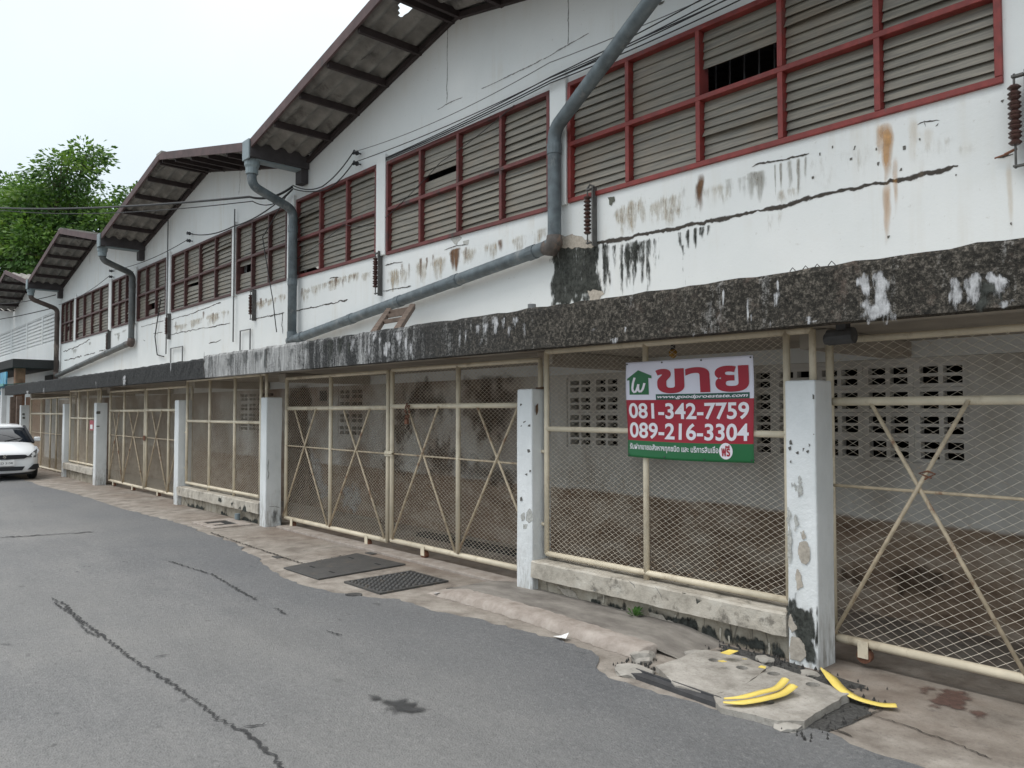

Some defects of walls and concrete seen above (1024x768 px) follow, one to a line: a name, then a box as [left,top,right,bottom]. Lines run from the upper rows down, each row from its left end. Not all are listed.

rust [882,129,892,166]
rust [696,178,704,201]
crack [597,165,958,244]
water stain [550,239,655,305]
mould [975,281,1002,312]
water stain [323,332,412,361]
efflorescence [459,317,517,341]
peeling [786,507,810,590]
crack [169,561,286,614]
mould [786,599,818,664]
crack [52,597,284,768]